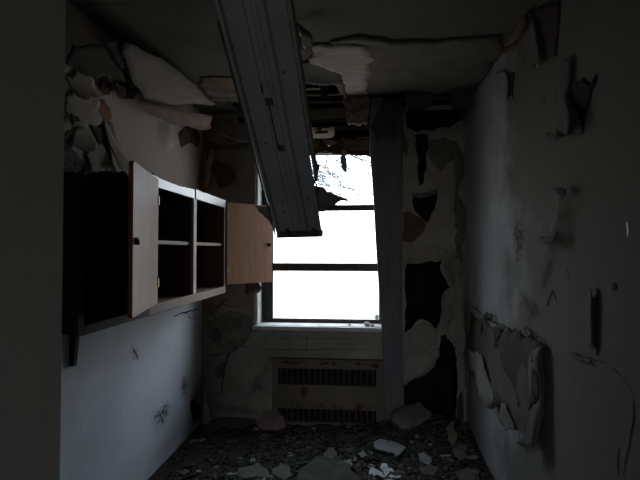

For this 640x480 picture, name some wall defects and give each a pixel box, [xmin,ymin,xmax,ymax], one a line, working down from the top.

peeling [64,39,240,173]
flaking render [296,0,560,141]
peeling [544,56,597,142]
peeling [402,109,545,448]
spalling [584,287,599,356]